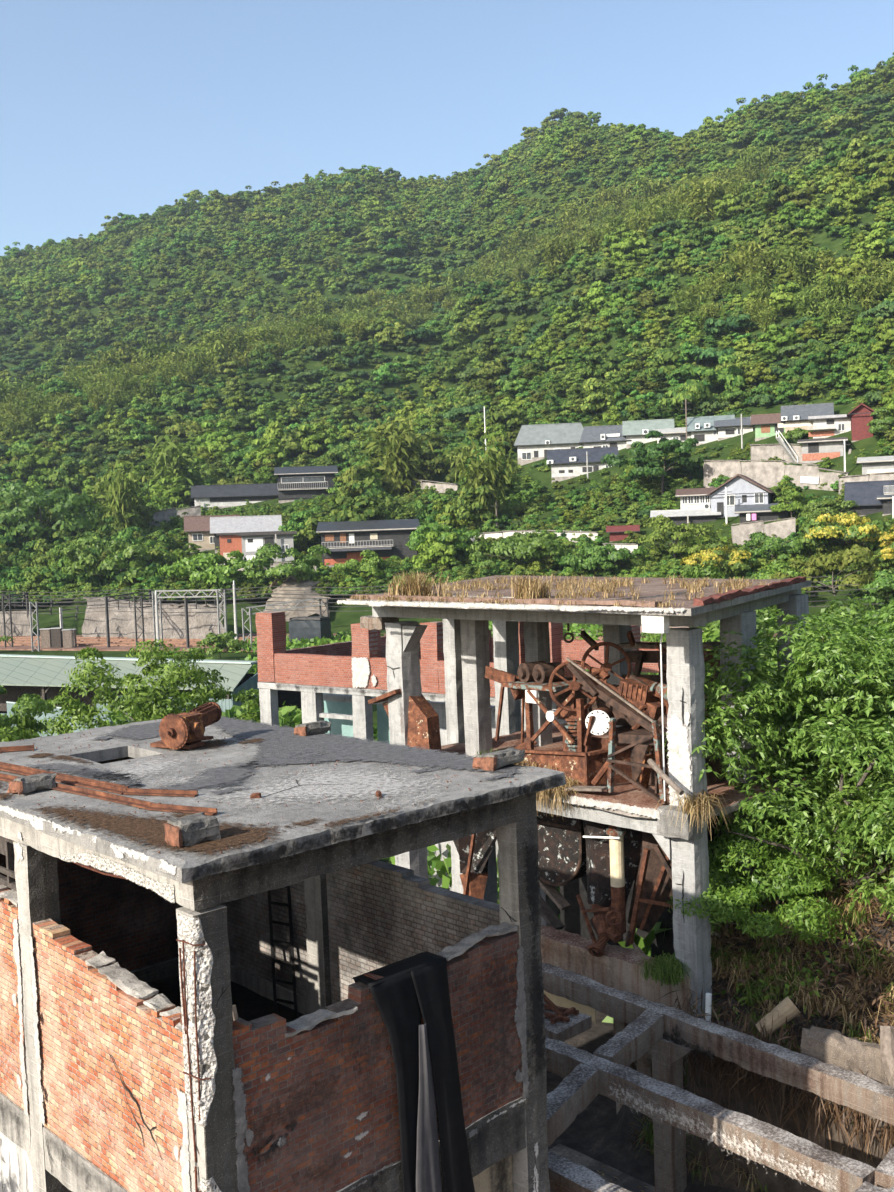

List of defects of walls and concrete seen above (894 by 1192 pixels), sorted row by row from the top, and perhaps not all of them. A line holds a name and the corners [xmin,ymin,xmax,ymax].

spalling [0,792,222,1192]
crack [107,1049,162,1159]